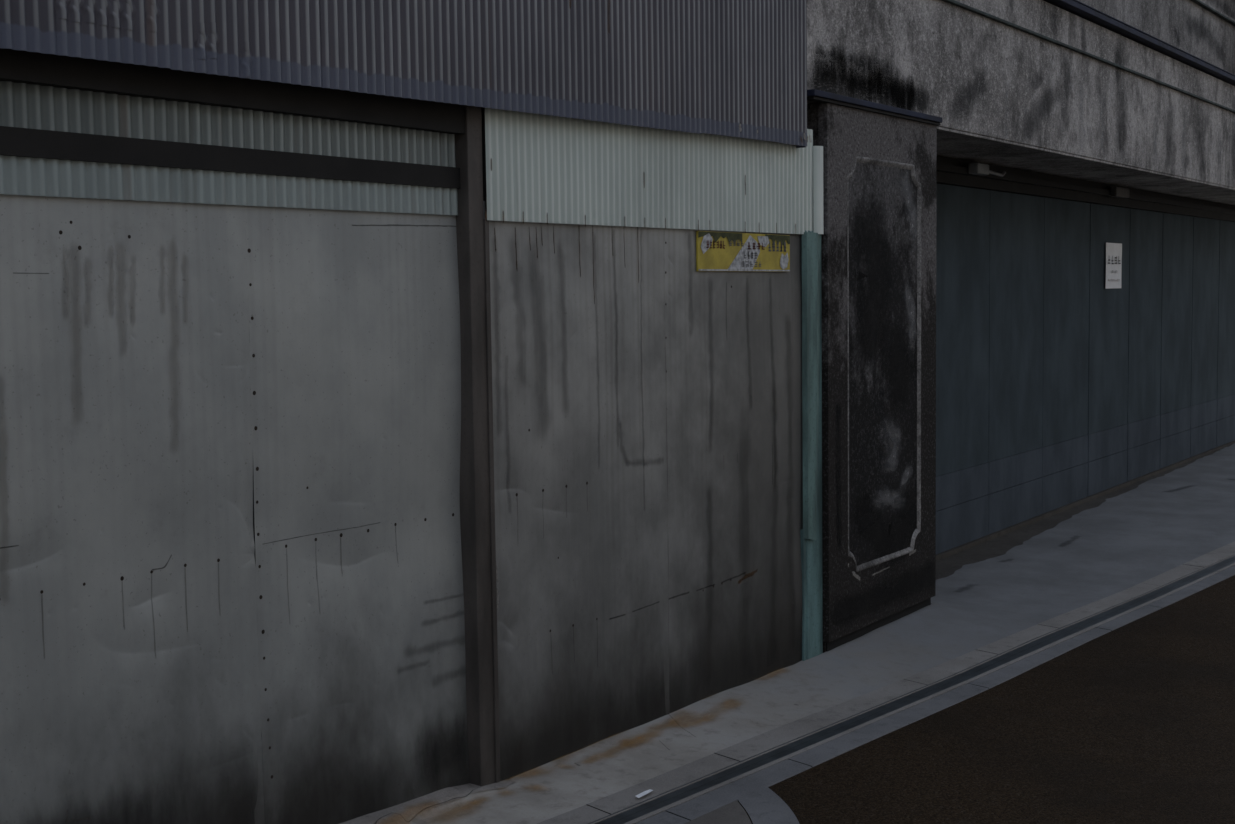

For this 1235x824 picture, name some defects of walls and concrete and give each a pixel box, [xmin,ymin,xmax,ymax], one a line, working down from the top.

leakage [815,48,915,110]